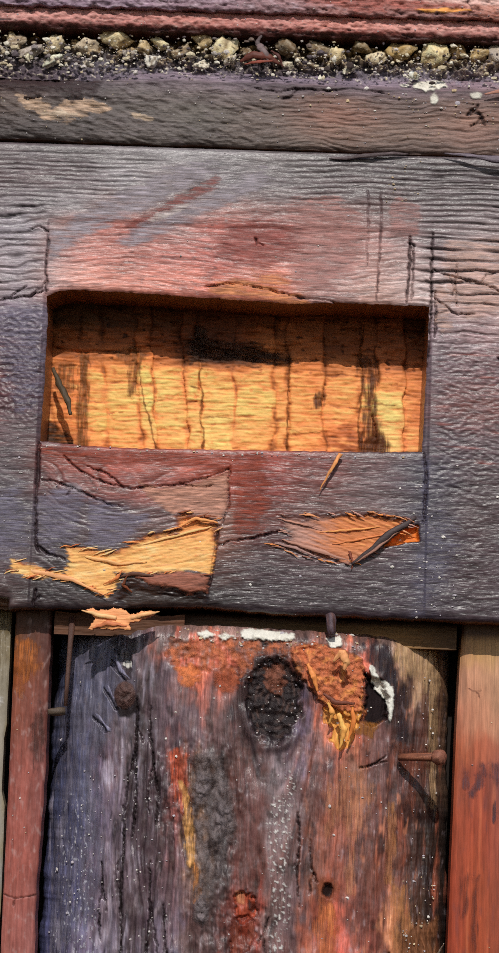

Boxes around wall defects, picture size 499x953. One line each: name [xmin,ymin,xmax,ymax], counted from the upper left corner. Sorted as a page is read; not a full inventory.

crack [406,238,499,358]
peeling [141,470,229,519]
peeling [135,571,209,596]
crack [98,715,159,932]
crack [146,879,167,953]